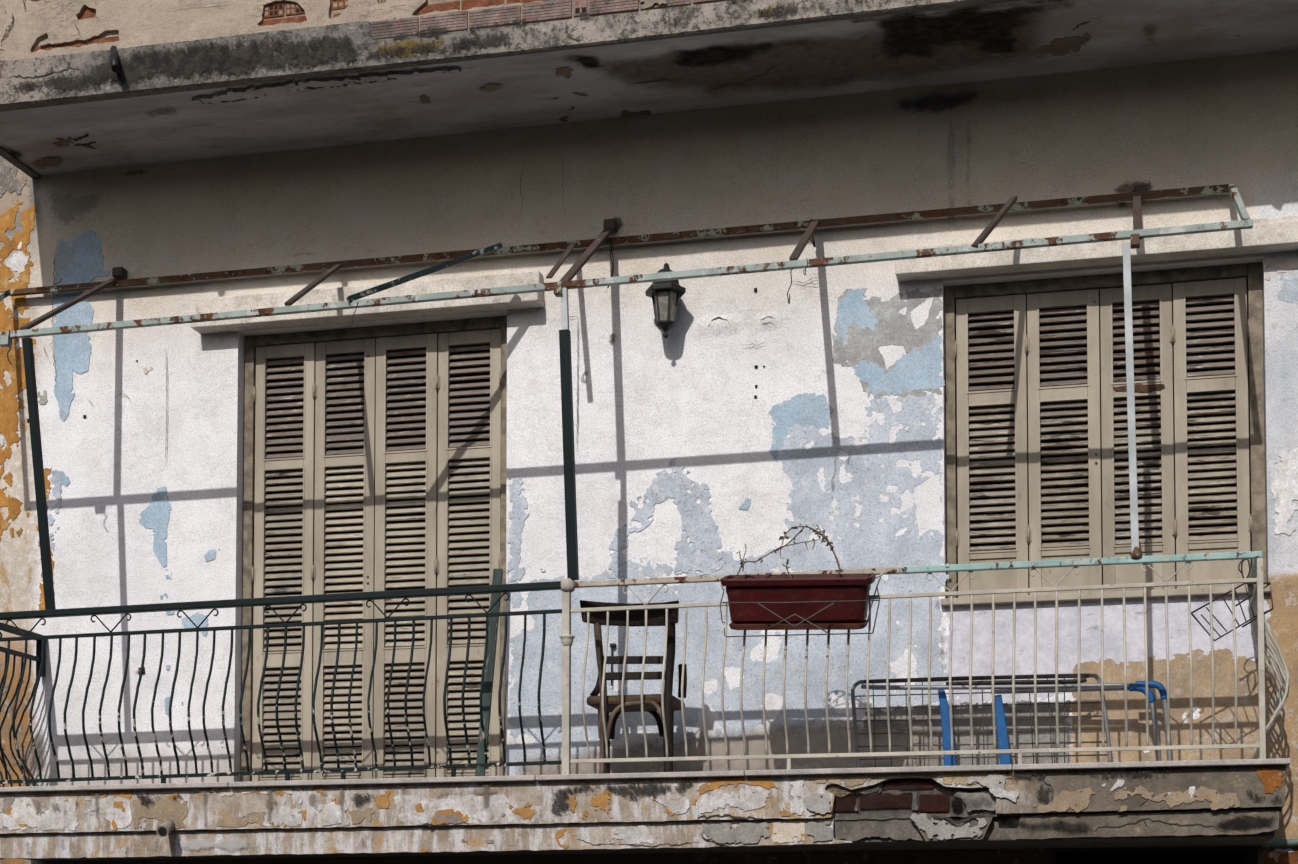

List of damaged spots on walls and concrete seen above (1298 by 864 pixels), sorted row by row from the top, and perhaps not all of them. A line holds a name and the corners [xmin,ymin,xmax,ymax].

flaking render [33,32,119,52]
flaking render [78,7,96,20]
flaking render [259,2,307,26]
flaking render [330,0,349,19]
flaking render [371,0,727,40]
water stain [569,0,1072,92]
peeling [1265,256,1298,304]
peeling [0,156,112,610]
peeling [1271,448,1298,536]
peeling [139,486,208,636]
peeling [502,287,1289,844]
peeling [0,787,547,843]